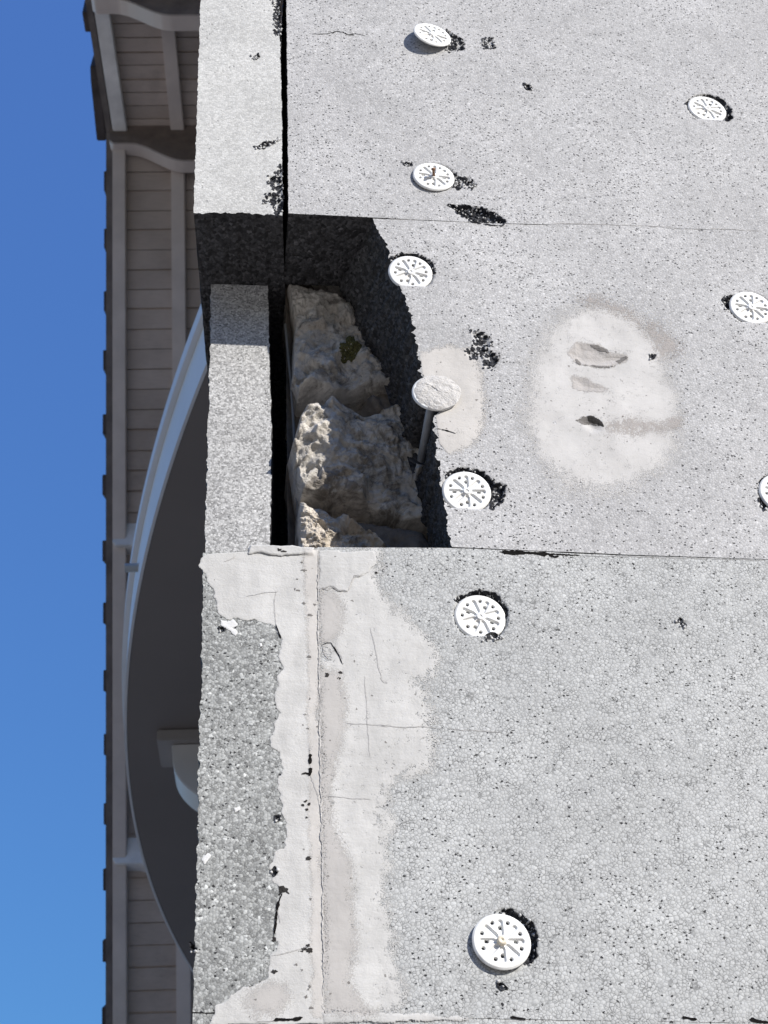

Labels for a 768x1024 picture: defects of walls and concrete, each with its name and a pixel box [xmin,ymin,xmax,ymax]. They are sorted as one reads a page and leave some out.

spalling [389,252,436,275]
spalling [270,866,289,895]